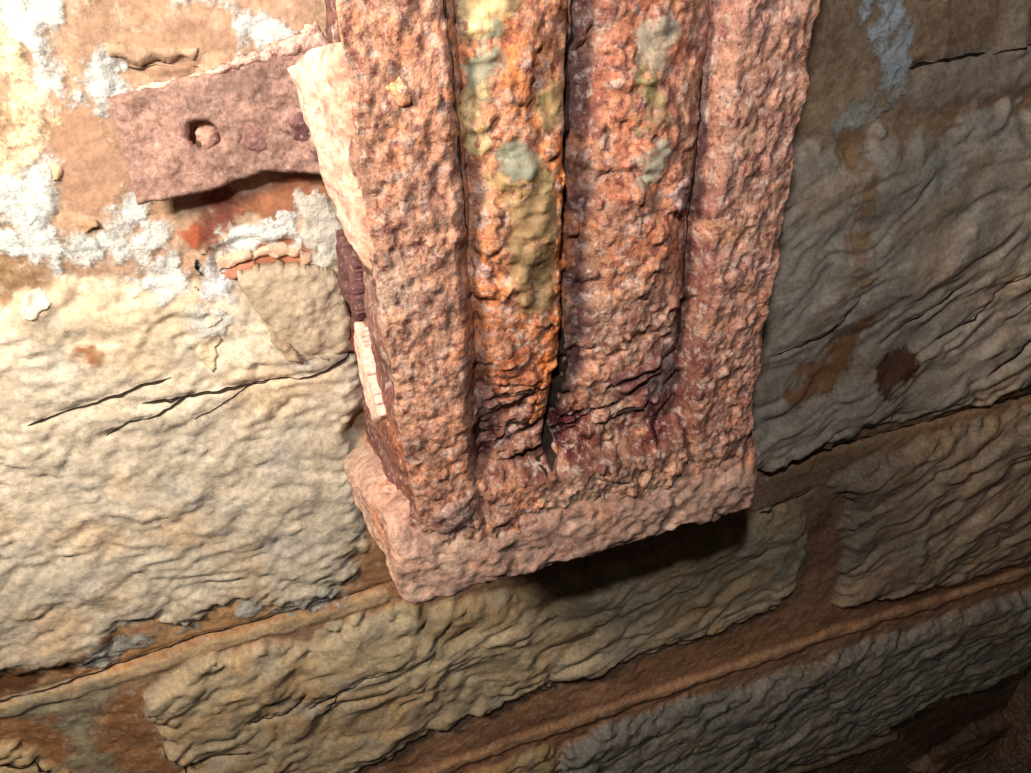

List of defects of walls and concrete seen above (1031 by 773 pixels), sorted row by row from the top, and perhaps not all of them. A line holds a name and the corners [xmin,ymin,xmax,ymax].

rust [106,21,329,102]
leakage [830,0,915,142]
rust [240,123,270,153]
rust [283,103,319,162]
leakage [0,0,343,348]
spalling [214,235,313,279]
crack [27,351,350,436]
leakage [876,345,920,401]
rust [352,532,400,597]